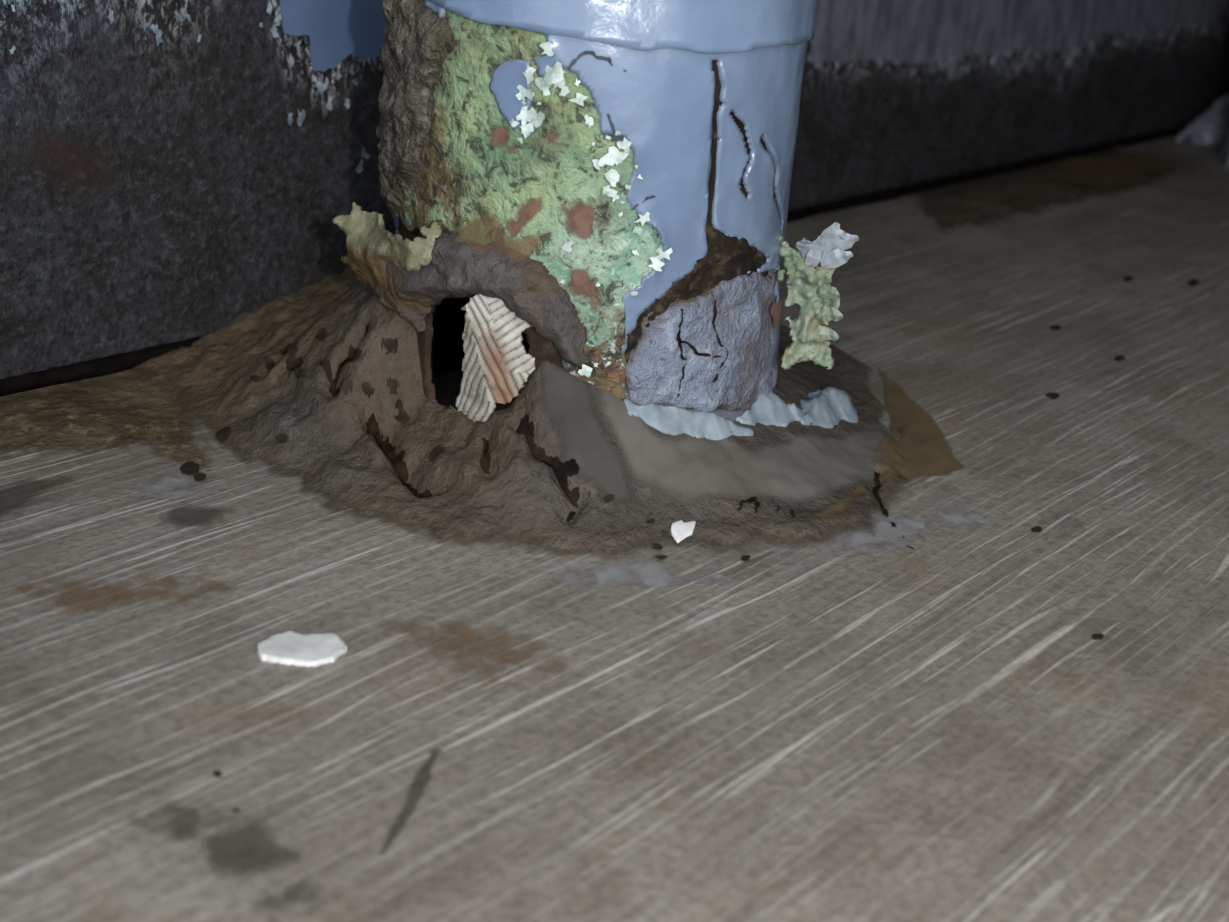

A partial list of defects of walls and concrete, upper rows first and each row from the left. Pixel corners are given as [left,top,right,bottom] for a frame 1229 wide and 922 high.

corrosion [491,126,516,153]
peeling [0,0,860,413]
corrosion [454,199,542,260]
corrosion [562,199,595,238]
crack [625,60,777,398]
corrosion [569,269,600,311]
spalling [319,360,410,423]
spalling [180,461,207,481]
water stain [0,481,53,514]
water stain [382,749,441,853]
water stain [208,825,293,871]